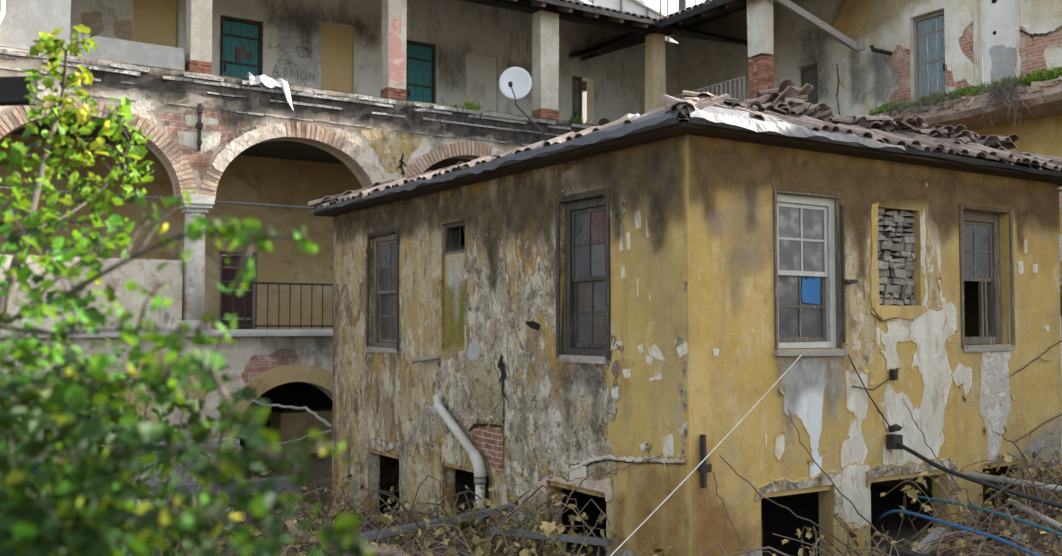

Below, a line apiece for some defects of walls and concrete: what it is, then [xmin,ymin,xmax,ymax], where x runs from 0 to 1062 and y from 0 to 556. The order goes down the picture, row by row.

flaking render [113,73,248,180]
peeling [268,8,536,175]
flaking render [885,44,911,109]
flaking render [1020,24,1062,78]
water stain [333,140,1060,288]
water stain [445,258,465,348]
peeling [335,208,631,530]
spalling [637,336,688,459]
peeling [754,201,1016,535]